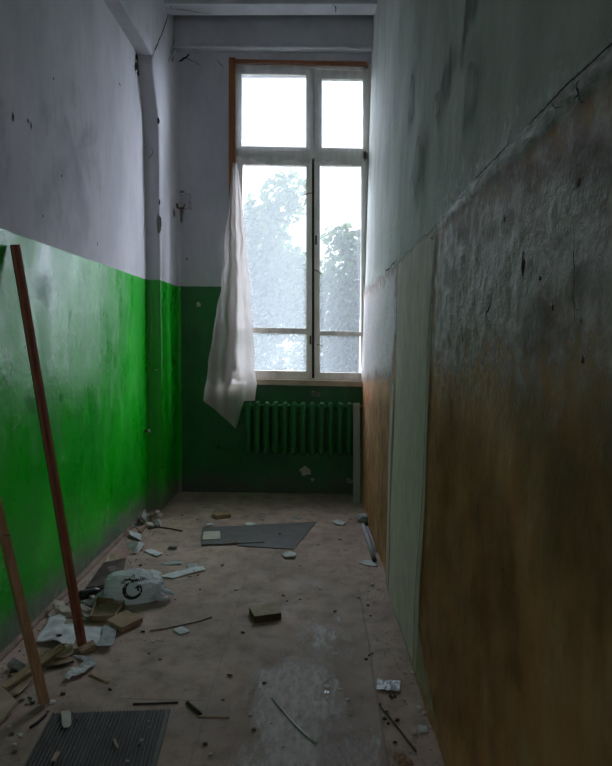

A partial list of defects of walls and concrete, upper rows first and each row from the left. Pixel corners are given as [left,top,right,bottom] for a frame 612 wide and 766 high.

crack [522,43,612,131]